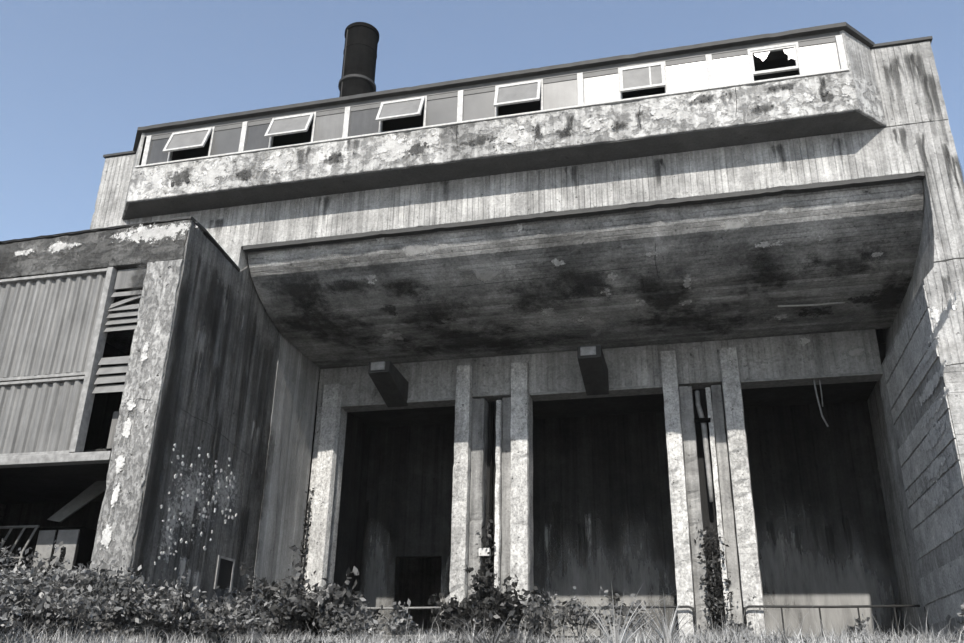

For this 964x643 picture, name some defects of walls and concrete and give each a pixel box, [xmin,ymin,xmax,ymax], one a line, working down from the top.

leakage [885,55,940,111]
leakage [944,146,964,183]
peeling [49,241,80,253]
peeling [112,221,198,244]
leakage [402,245,435,255]
leakage [281,270,374,348]
leakage [385,282,564,355]
leakage [633,277,755,332]
spalling [121,397,136,438]
leakage [132,260,273,596]
spalling [111,451,125,507]
spalling [100,524,112,550]